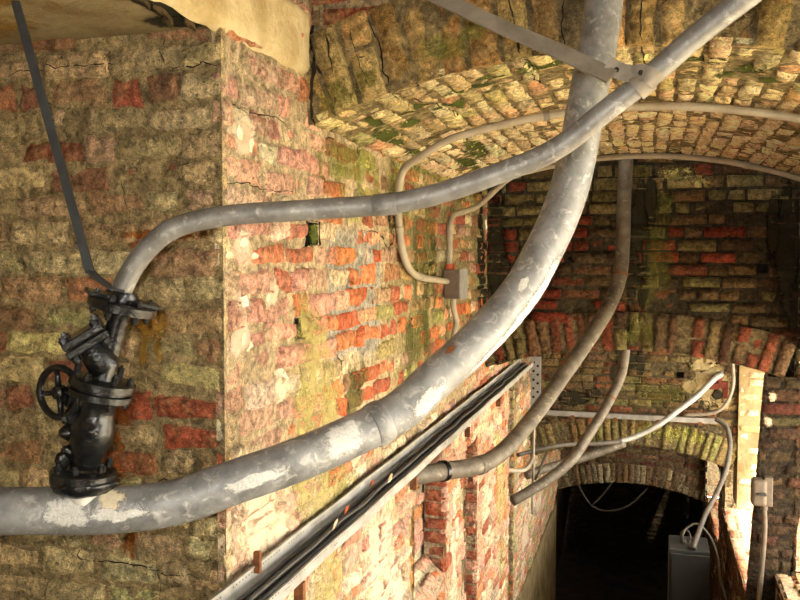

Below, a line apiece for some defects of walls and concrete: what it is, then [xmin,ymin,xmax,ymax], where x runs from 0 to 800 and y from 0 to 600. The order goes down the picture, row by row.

crack [559,1,567,45]
crack [638,0,646,64]
crack [11,54,121,75]
crack [159,38,217,85]
crack [309,6,333,125]
crack [226,100,291,129]
corrosion [130,310,167,364]
crack [77,547,199,592]